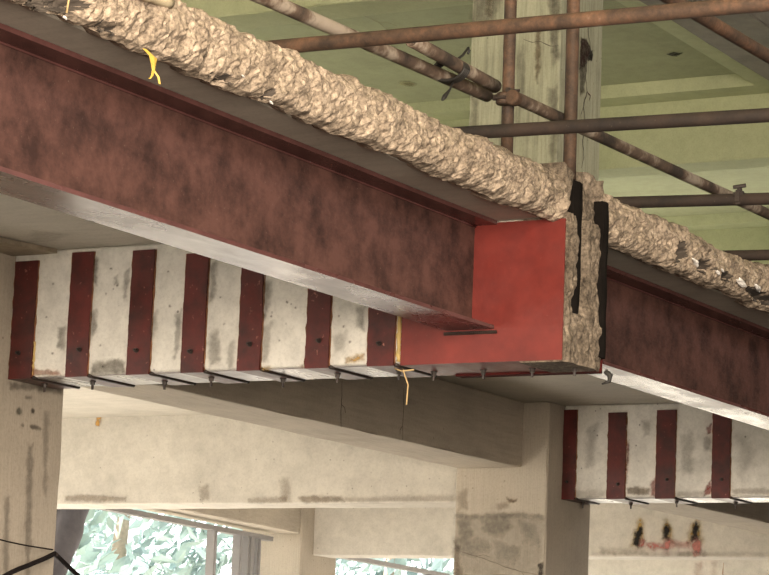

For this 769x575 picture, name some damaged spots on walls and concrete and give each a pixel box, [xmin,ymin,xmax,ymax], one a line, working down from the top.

spalling [600,193,769,313]